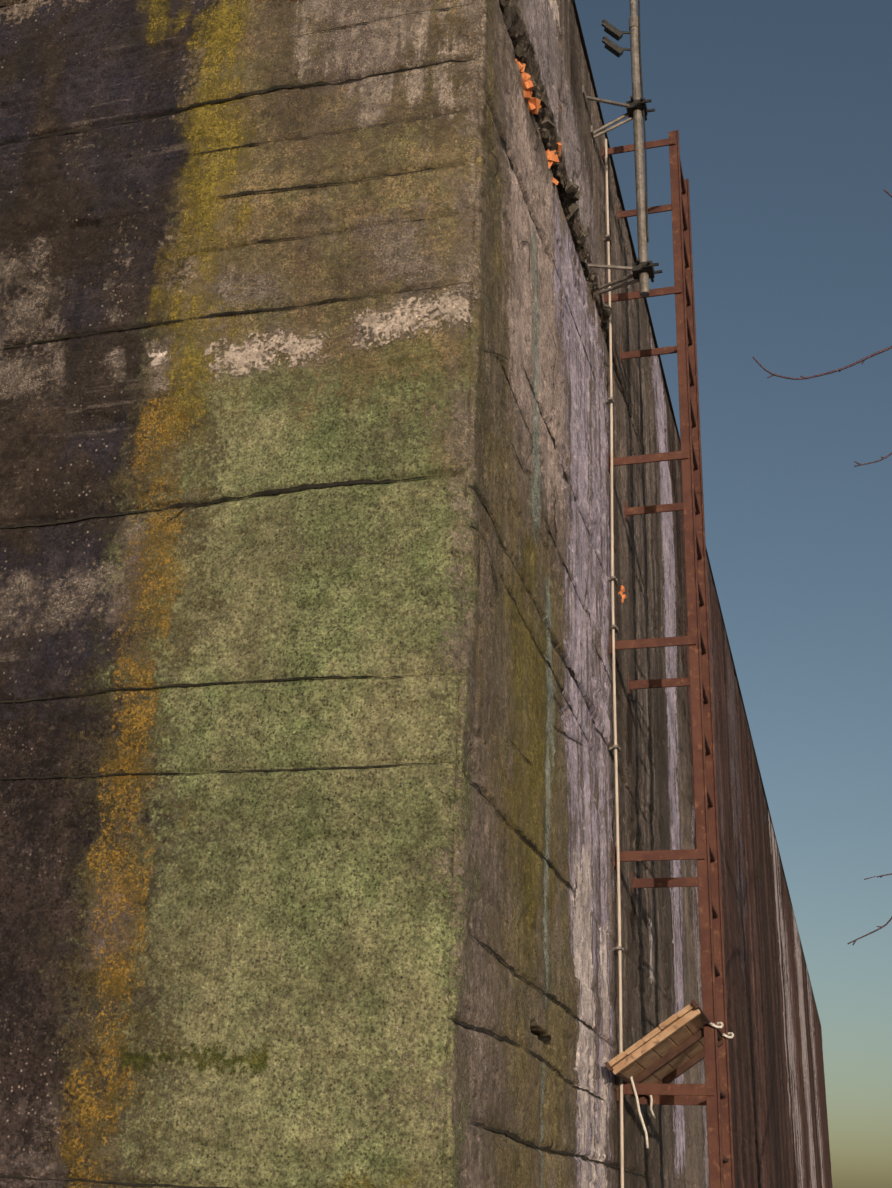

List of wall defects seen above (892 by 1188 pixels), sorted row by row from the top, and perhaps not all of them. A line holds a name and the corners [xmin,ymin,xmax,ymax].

water stain [293,0,477,128]
spalling [515,59,545,119]
spalling [545,142,562,185]
water stain [0,0,233,1188]
water stain [523,0,614,1188]